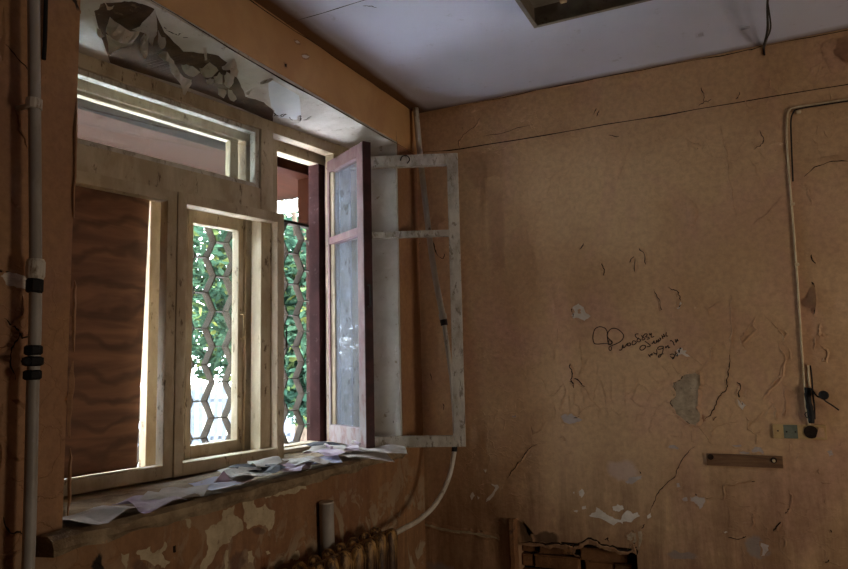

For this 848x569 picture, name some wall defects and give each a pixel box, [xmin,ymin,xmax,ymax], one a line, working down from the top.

peeling [92,0,311,123]
crack [0,296,28,474]
crack [569,364,585,388]
flaking render [666,369,704,428]
crack [637,287,792,532]
peeling [199,486,307,569]
flaking render [519,487,652,558]